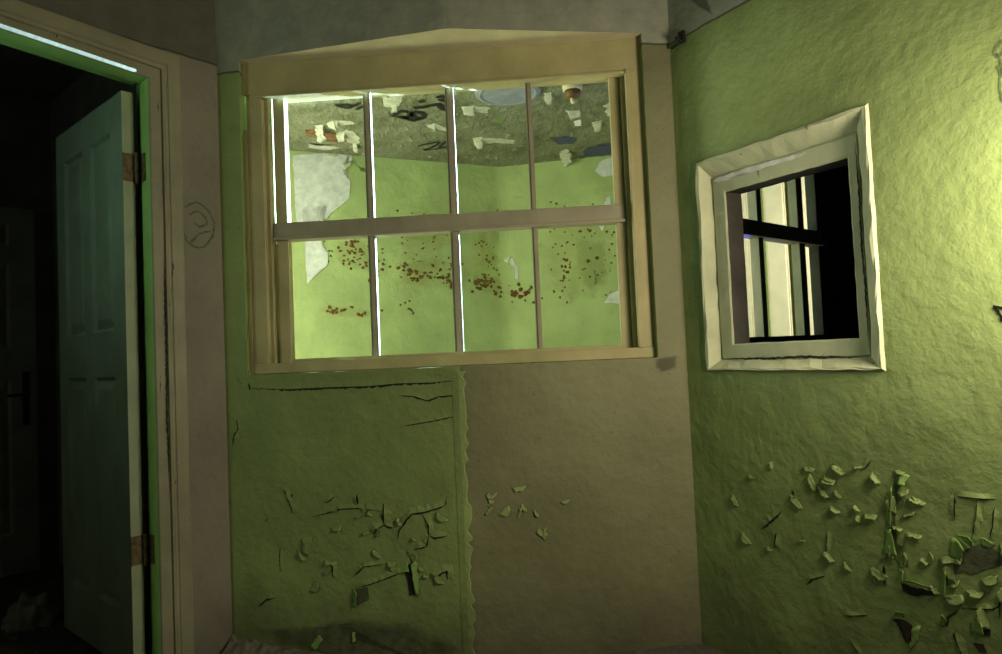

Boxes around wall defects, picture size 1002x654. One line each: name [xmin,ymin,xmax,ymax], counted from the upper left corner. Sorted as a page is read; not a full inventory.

crack [242,374,461,427]
spalling [392,561,419,596]
spalling [802,463,1002,653]